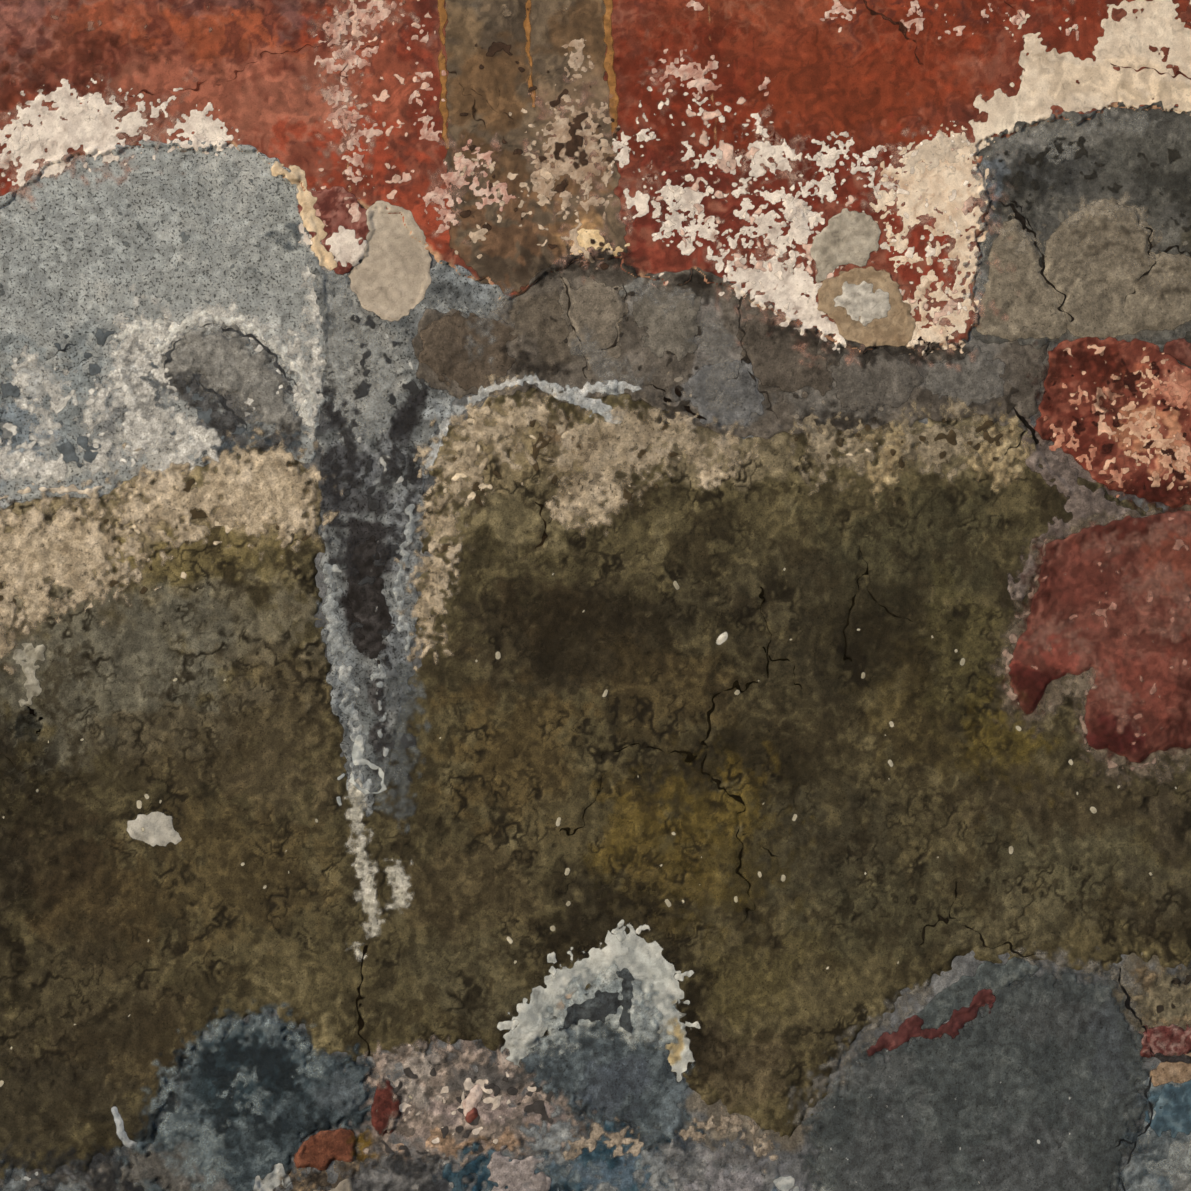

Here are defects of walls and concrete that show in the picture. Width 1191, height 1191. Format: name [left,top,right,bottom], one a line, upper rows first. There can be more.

crack [999,201,1074,322]
crack [1117,204,1191,298]
damp [0,428,338,674]
damp [401,392,758,670]
spalling [0,0,1191,831]
damp [790,398,1035,508]
crack [560,586,801,920]
damp [497,920,700,1082]
peeling [867,989,996,1056]
spalling [348,1020,799,1191]
damp [551,1123,643,1160]
spalling [1118,1053,1191,1191]